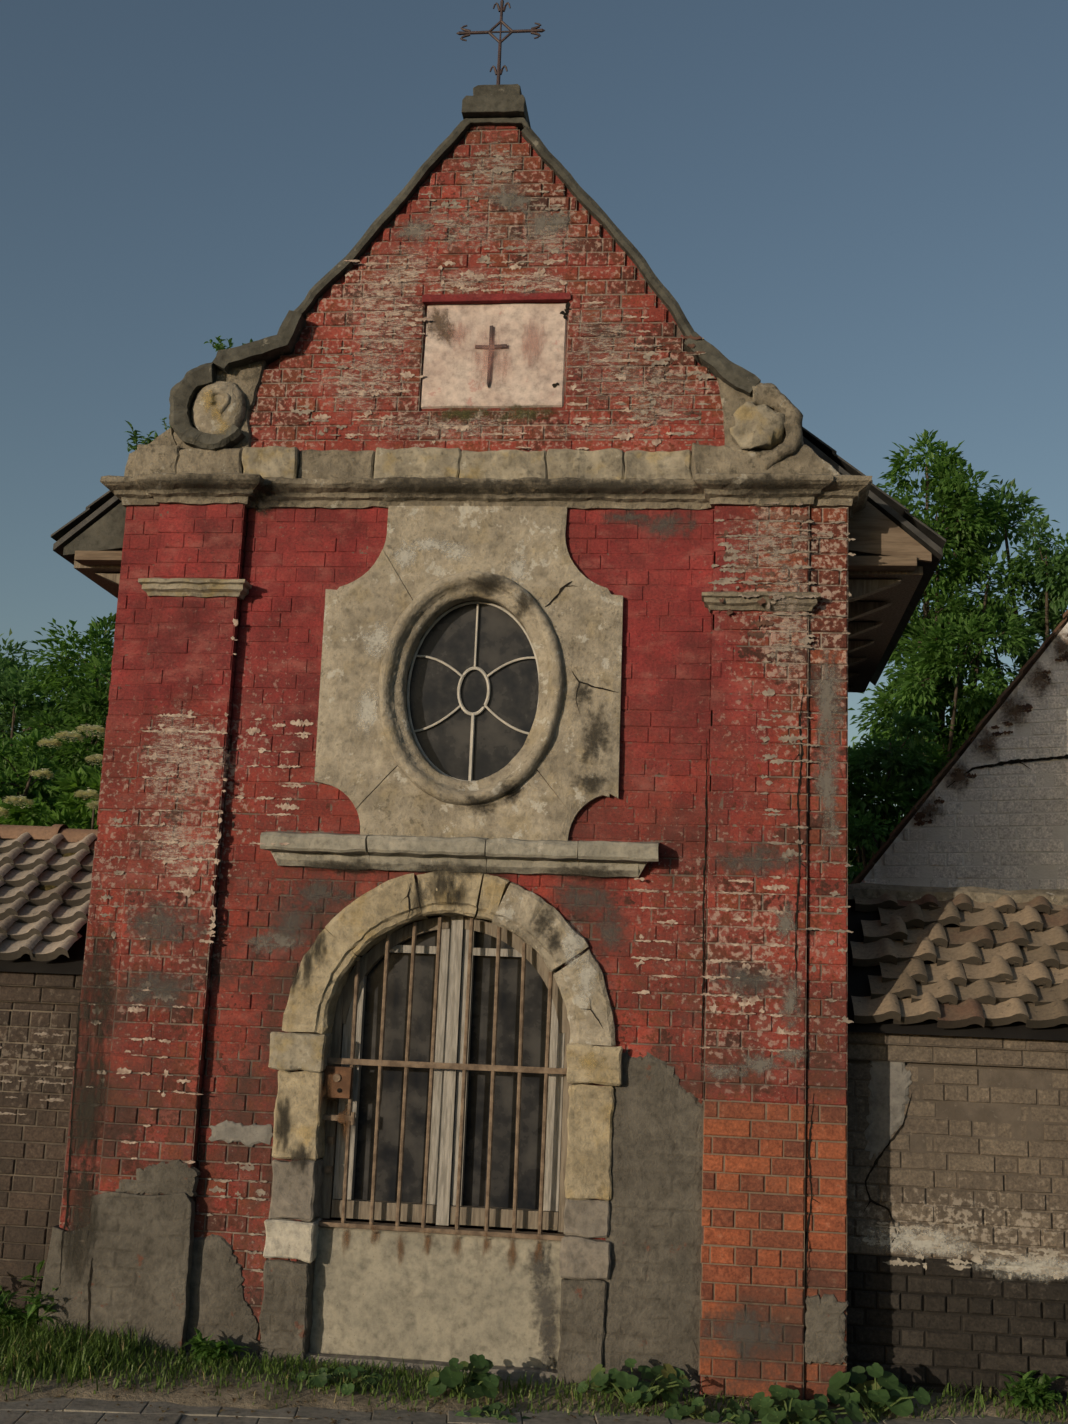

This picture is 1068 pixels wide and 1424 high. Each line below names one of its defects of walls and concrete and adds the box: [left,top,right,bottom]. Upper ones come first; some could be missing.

peeling [291,189,605,449]
crack [545,581,574,607]
water stain [973,629,1068,758]
peeling [142,710,314,845]
crack [947,754,1068,788]
peeling [112,809,224,944]
peeling [700,688,854,1052]
peeling [0,1032,204,1160]
water stain [276,1101,308,1170]
crack [863,1094,919,1254]
water stain [870,1229,966,1255]
water stain [987,1259,1068,1278]